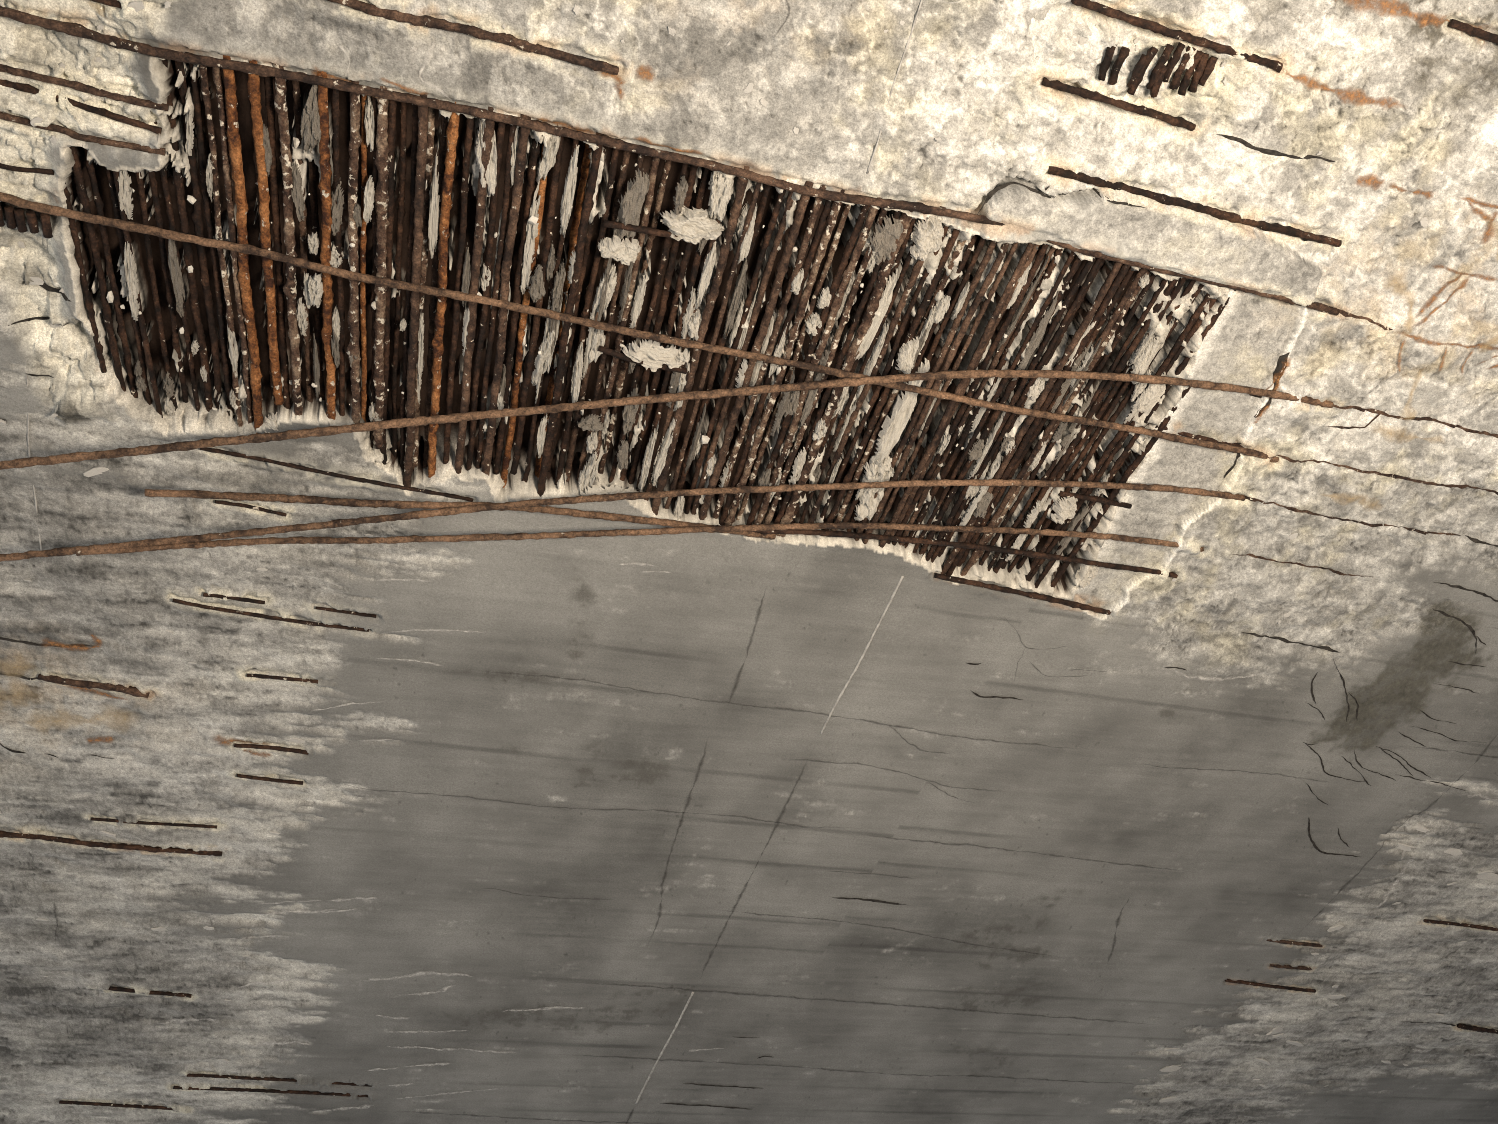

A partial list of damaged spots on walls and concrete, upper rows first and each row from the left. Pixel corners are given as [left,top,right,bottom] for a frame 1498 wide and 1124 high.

rust [1348,0,1498,45]
crack [1217,134,1335,162]
crack [977,182,1145,215]
rust [0,0,1342,615]
peeling [0,0,1498,693]
rust [172,592,376,632]
rust [37,674,150,699]
leakage [1306,597,1497,765]
crack [1242,582,1498,857]
rust [0,830,223,856]
rust [91,817,217,829]
peeling [0,542,509,1124]